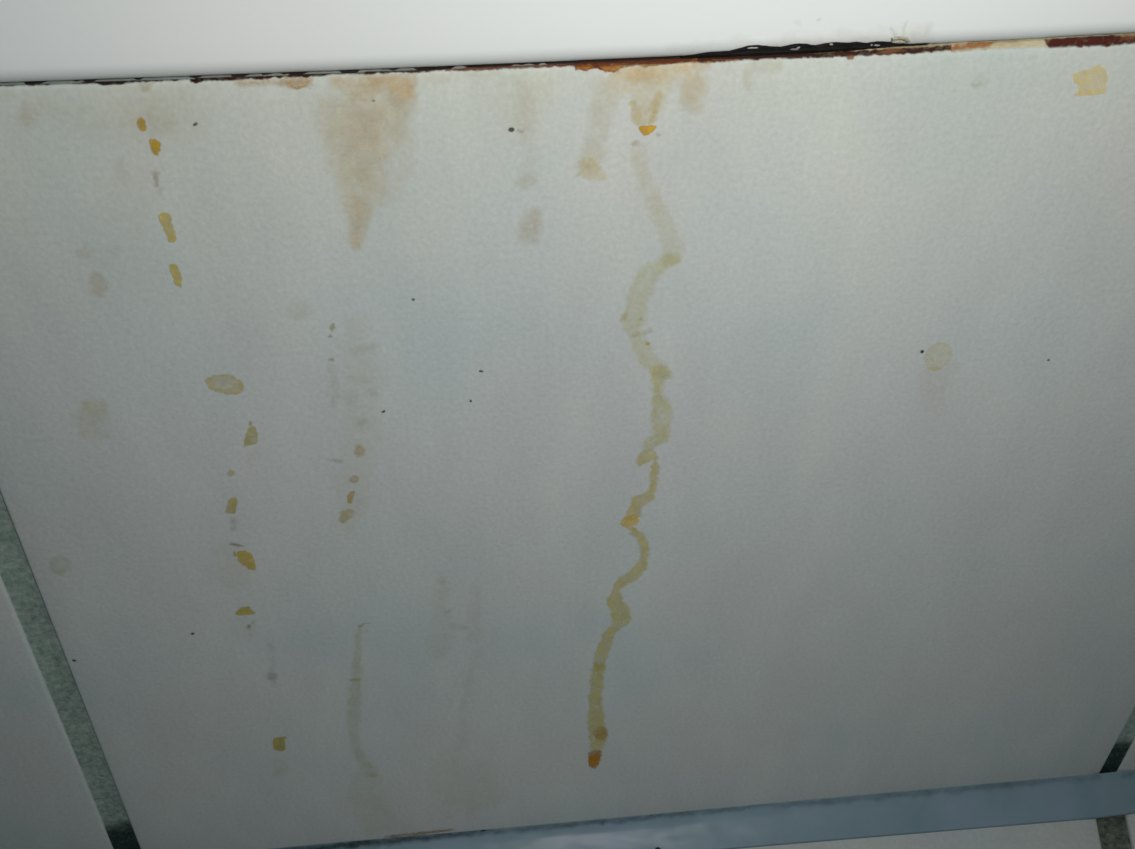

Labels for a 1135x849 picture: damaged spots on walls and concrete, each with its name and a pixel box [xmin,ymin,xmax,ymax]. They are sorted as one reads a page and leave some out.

rust [1046,35,1135,47]
rust [74,36,992,95]
damp [137,118,160,155]
damp [159,213,176,242]
damp [170,264,182,287]
damp [234,544,255,570]
damp [236,607,255,615]
damp [273,737,285,751]